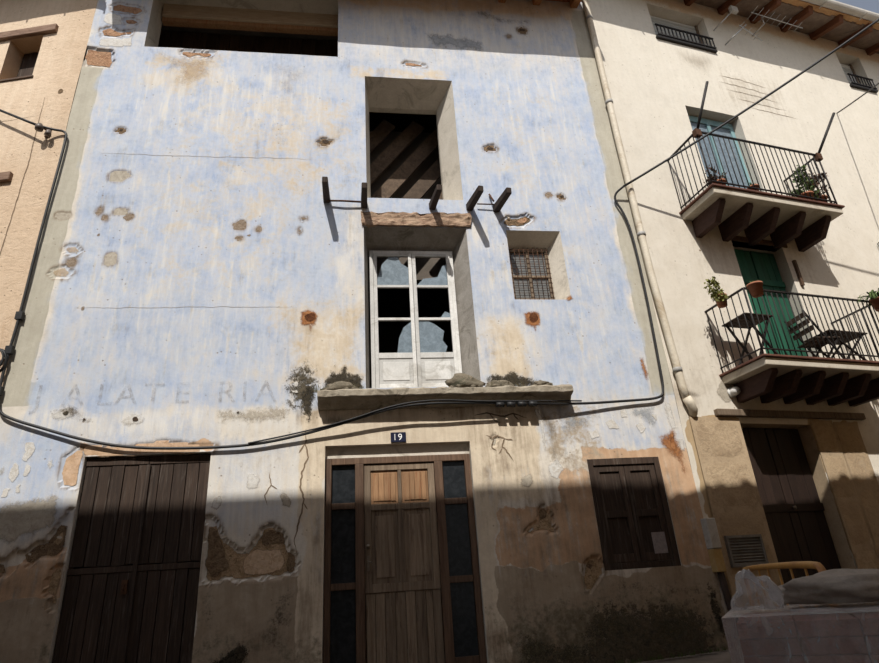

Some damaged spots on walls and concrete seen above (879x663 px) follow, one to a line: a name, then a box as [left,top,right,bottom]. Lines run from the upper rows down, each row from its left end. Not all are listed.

peeling [85,5,142,67]
flaking render [504,216,530,226]
corrosion [301,310,317,327]
corrosion [525,311,540,326]
peeling [62,440,200,486]
crack [477,412,526,460]
corrosion [661,431,685,471]
peeling [0,442,67,562]
crack [294,435,309,555]
flaking render [205,522,296,581]
leakage [696,584,725,638]
leakage [211,643,248,663]